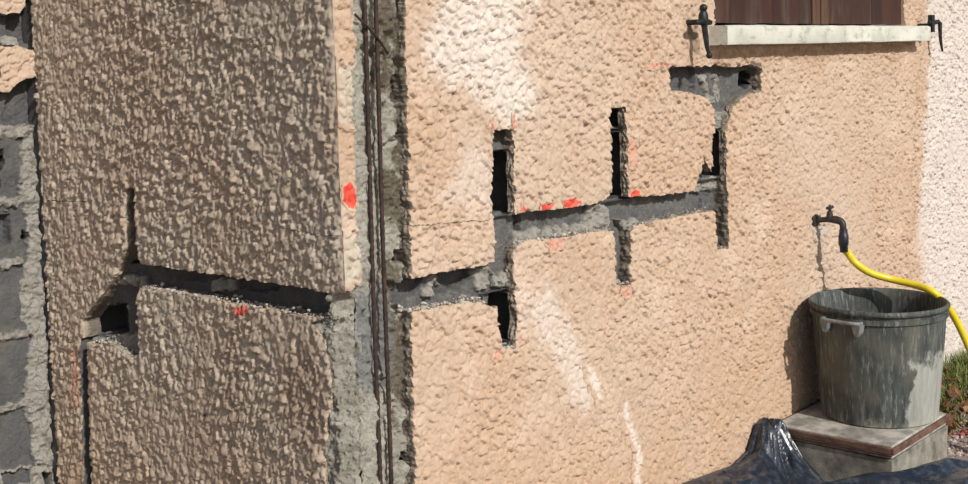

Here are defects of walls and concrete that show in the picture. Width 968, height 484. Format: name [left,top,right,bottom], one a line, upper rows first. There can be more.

flaking render [0,0,28,49]
spalling [311,0,417,484]